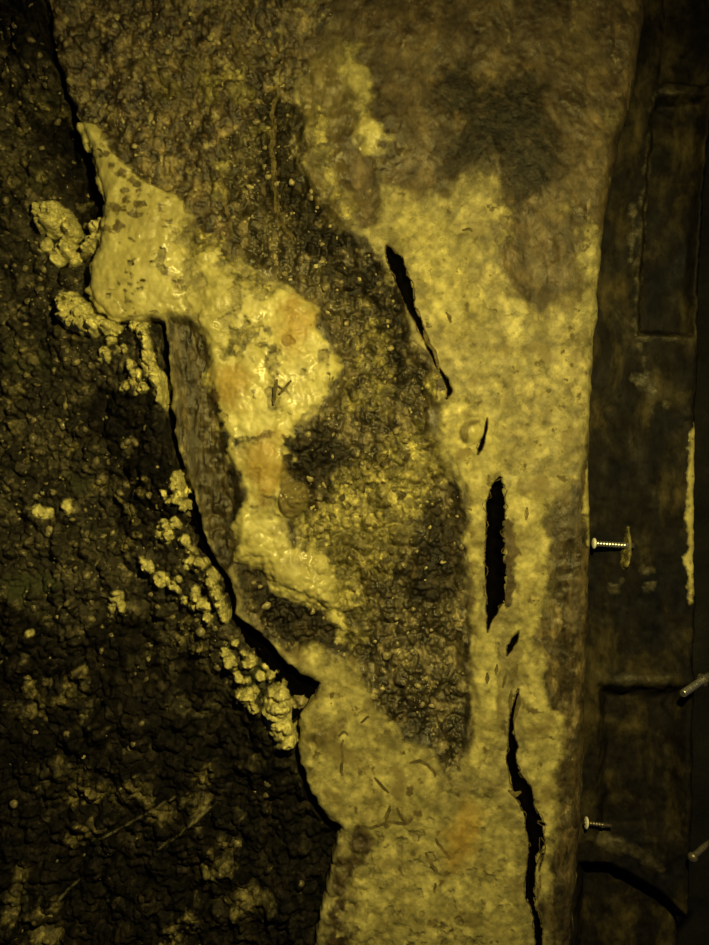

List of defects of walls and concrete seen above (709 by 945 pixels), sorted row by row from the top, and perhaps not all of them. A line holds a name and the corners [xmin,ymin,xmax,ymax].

leakage [182,59,255,104]
spalling [56,400,168,514]
crack [163,333,180,455]
spalling [24,0,442,494]
crack [185,493,298,691]
leakage [0,100,528,945]
spalling [276,445,338,554]
spalling [235,463,474,773]
crack [385,244,453,398]
leakage [252,0,644,419]
crack [476,418,489,454]
crack [482,479,547,945]